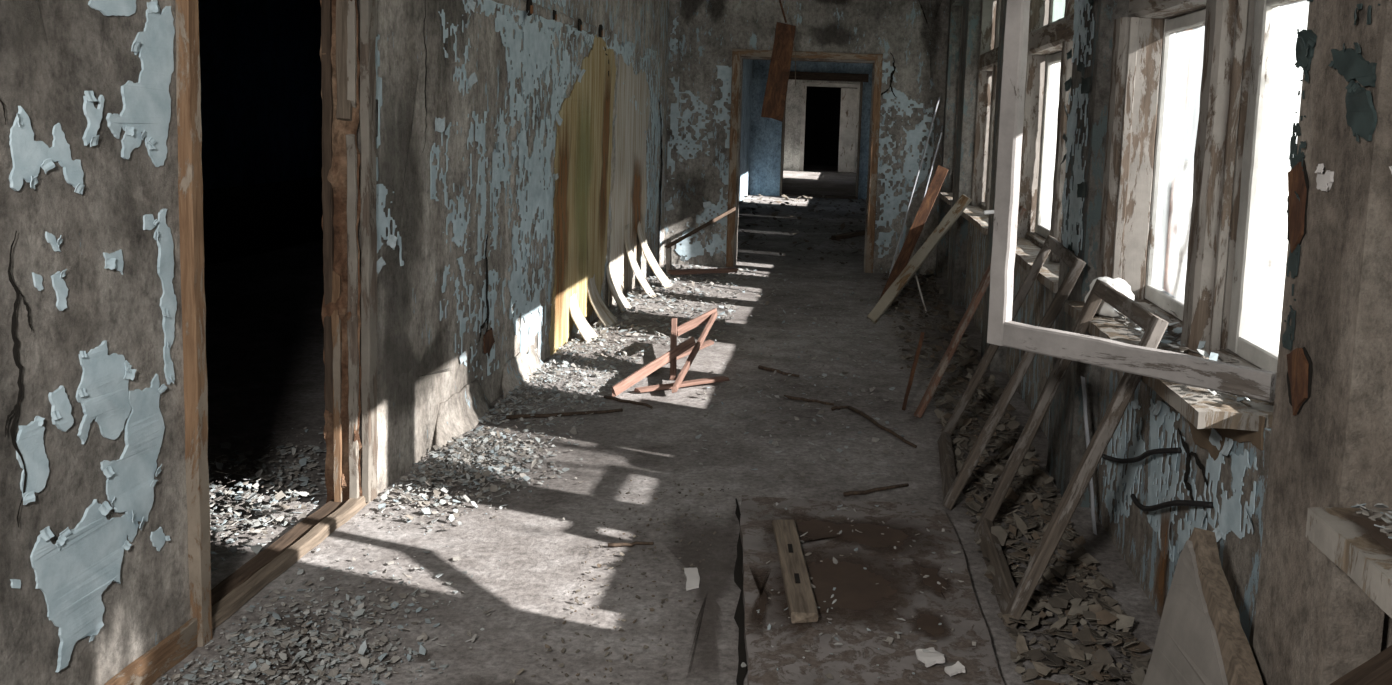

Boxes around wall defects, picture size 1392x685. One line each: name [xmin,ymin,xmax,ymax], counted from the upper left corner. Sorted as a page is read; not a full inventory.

peeling [9,0,175,194]
peeling [430,0,732,380]
peeling [875,53,934,258]
spalling [1282,28,1377,416]
peeling [10,209,177,672]
peeling [1101,399,1265,562]